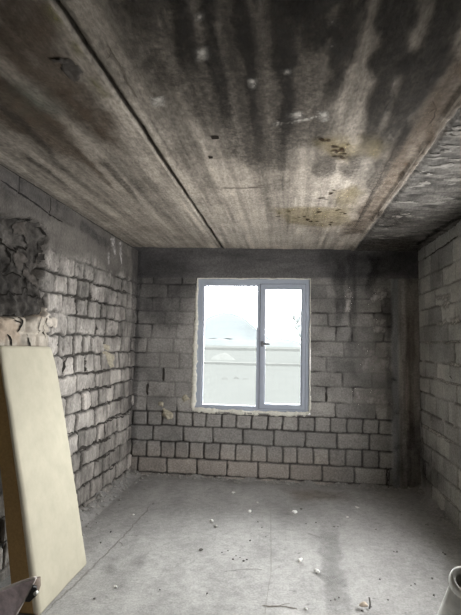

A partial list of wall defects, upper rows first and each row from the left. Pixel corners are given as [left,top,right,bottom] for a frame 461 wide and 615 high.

leakage [117,0,367,166]
leakage [344,0,461,234]
spalling [0,217,58,346]